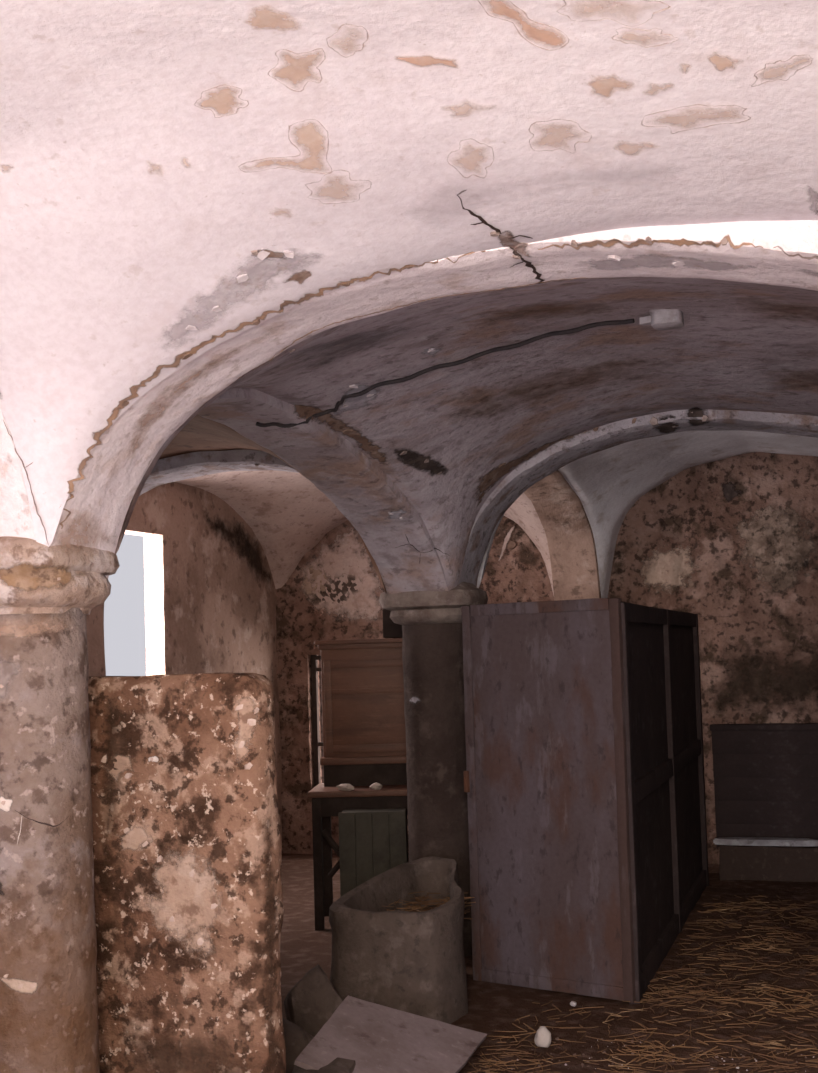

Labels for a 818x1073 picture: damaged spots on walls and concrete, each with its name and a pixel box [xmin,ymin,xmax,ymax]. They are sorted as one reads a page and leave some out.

crack [457,190,545,284]
peeling [60,248,485,529]
spalling [238,278,578,379]
leakage [712,649,818,711]
leakage [105,702,127,825]
leakage [265,820,277,1073]